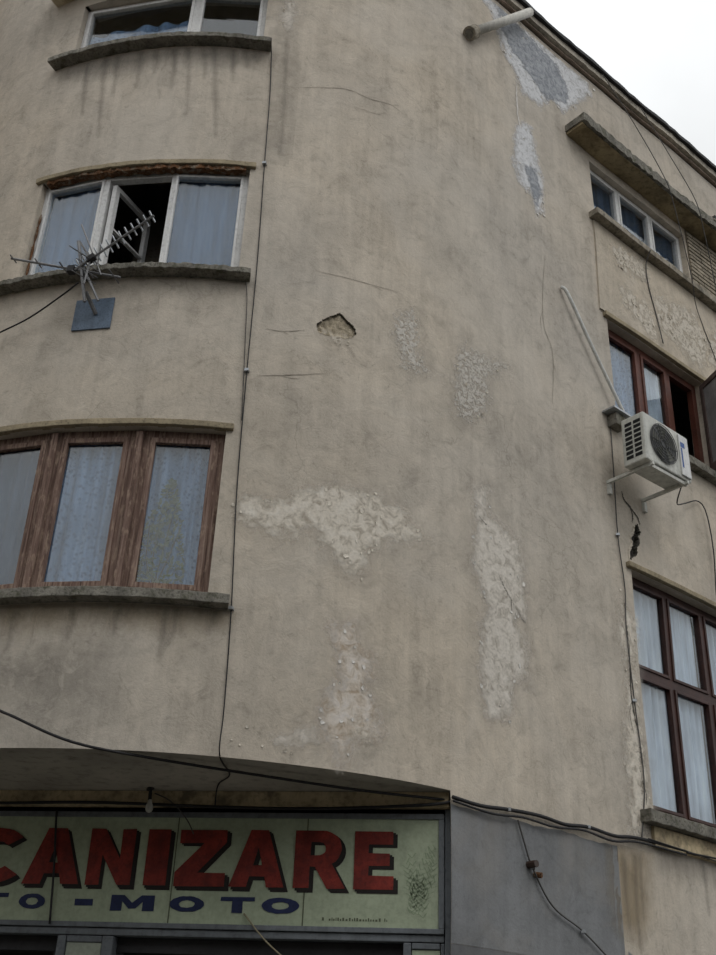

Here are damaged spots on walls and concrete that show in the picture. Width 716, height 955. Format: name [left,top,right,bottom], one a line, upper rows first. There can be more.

peeling [484,0,595,217]
spalling [317,313,356,351]
peeling [454,347,507,422]
peeling [231,485,422,581]
crack [621,491,641,560]
peeling [471,487,528,724]
peeling [261,622,384,764]